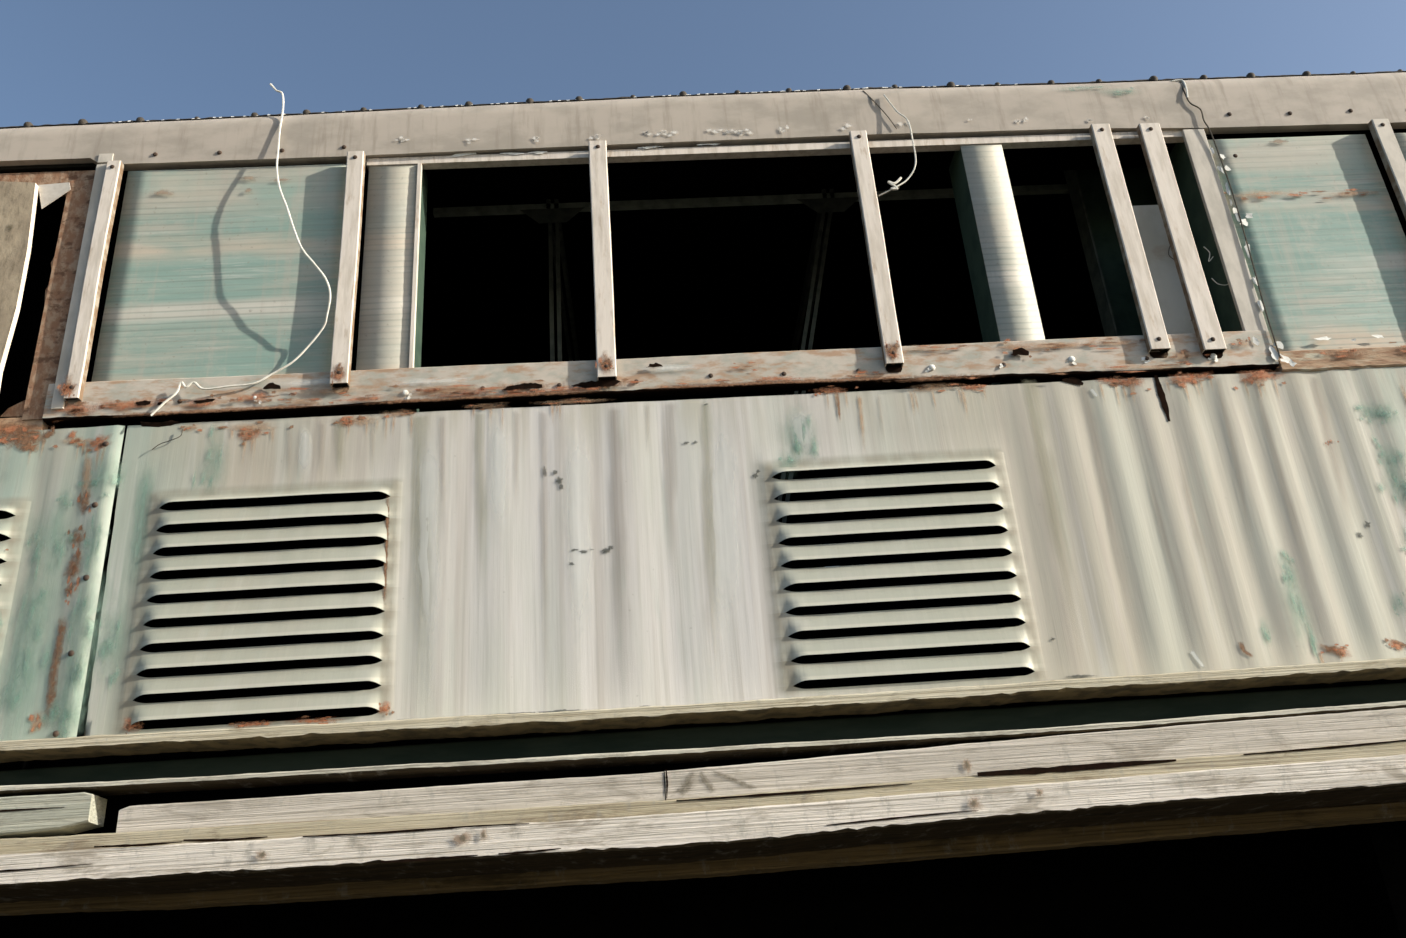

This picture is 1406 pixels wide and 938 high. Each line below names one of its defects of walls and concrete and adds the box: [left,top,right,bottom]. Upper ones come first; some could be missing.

rust [1224,189,1368,200]
rust [1003,338,1145,358]
rust [661,341,986,418]
rust [1101,349,1213,395]
rust [0,355,643,605]
rust [1320,644,1349,660]
rust [29,622,66,731]